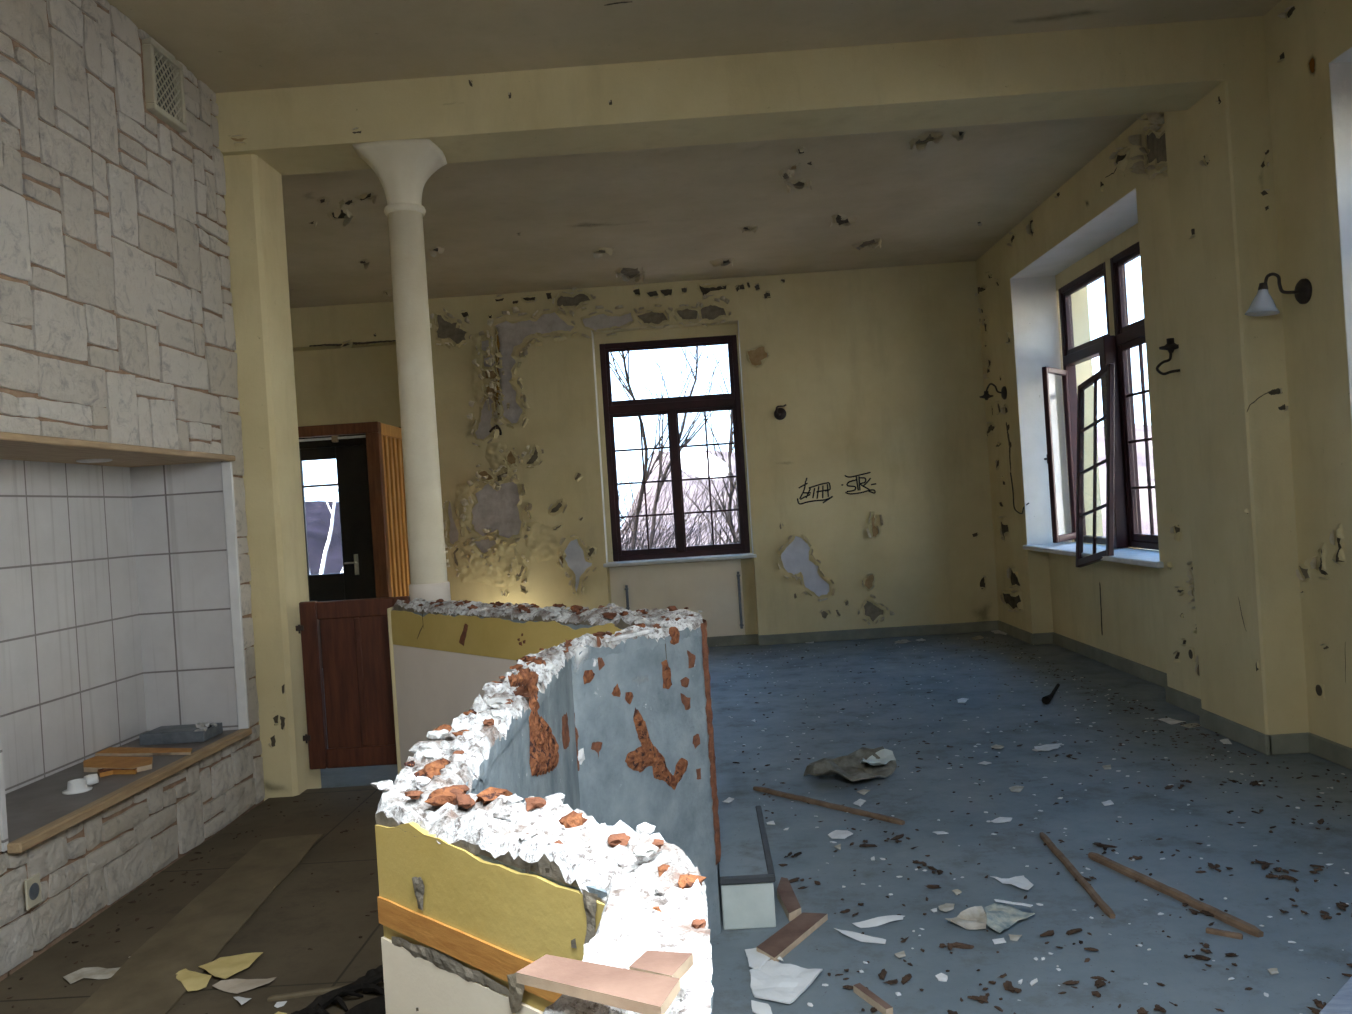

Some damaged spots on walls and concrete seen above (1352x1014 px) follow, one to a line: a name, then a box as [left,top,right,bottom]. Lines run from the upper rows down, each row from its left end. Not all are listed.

peeling [1116,112,1168,180]
peeling [637,279,785,330]
peeling [746,345,770,368]
peeling [430,287,597,596]
peeling [776,524,895,625]
flaking render [583,636,605,684]
flaking render [508,667,602,777]
flaking render [612,619,721,866]
flaking render [394,827,608,948]